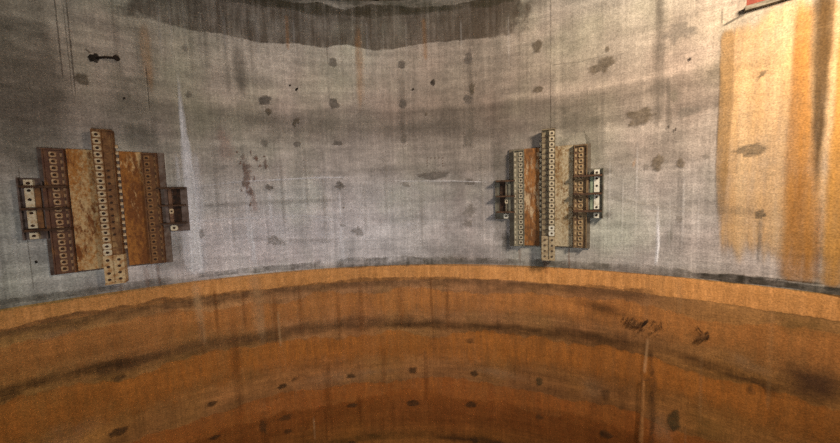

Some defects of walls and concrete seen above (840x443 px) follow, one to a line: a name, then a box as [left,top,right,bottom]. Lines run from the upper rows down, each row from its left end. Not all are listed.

damp [183,0,528,50]
damp [180,104,203,272]
corrosion [0,0,840,332]